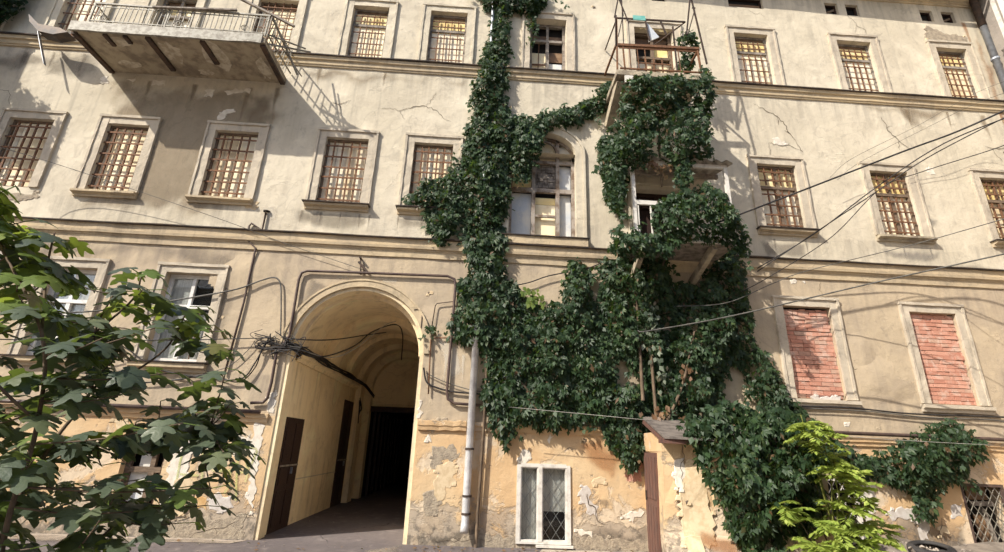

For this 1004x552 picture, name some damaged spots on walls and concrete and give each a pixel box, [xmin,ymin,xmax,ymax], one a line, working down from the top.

flaking render [163,422,265,540]
peeling [416,400,467,517]
peeling [577,476,608,519]
flaking render [571,529,649,552]
peeling [620,508,645,522]
flaking render [625,463,643,483]
peeling [670,458,717,552]
flaking render [862,480,963,540]